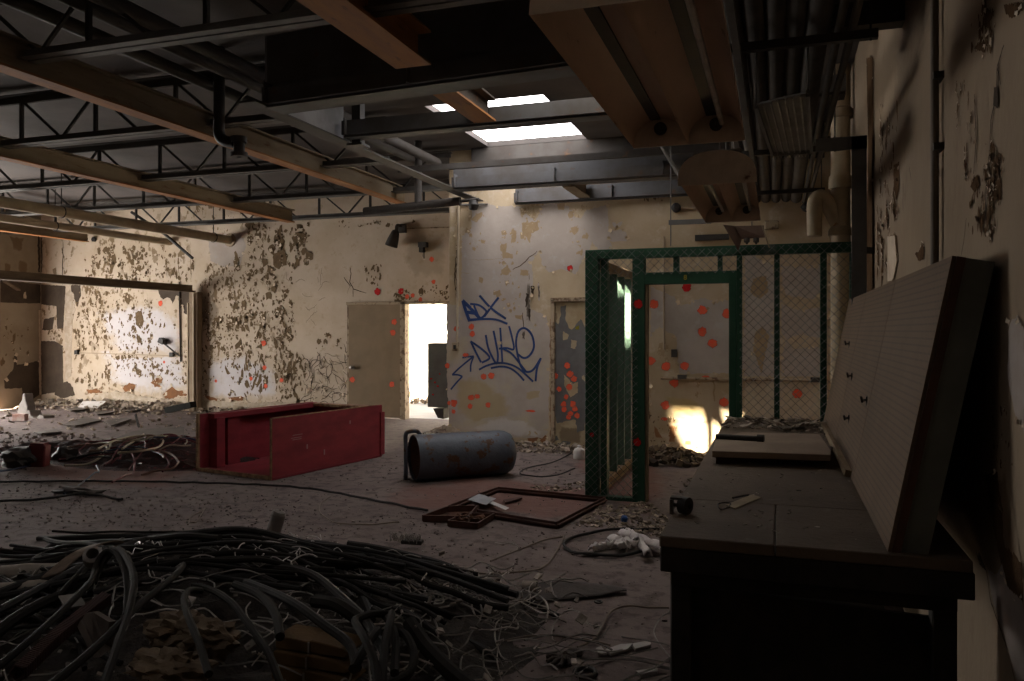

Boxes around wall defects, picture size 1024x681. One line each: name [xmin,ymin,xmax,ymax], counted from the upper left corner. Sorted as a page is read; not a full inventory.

peeling [971,0,1023,58]
spalling [866,55,899,292]
peeling [955,81,1004,242]
peeling [0,222,313,410]
peeling [393,202,630,446]